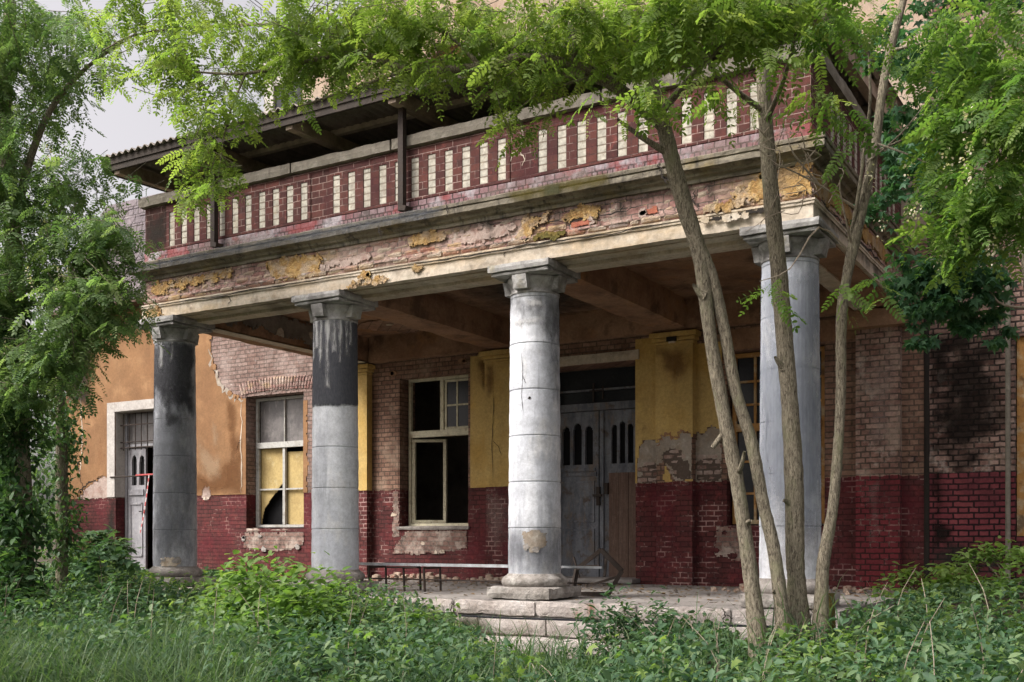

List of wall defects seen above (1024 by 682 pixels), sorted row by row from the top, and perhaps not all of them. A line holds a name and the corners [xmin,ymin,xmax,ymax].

flaking render [700,173,764,224]
flaking render [408,203,601,247]
flaking render [145,267,233,317]
flaking render [265,251,389,289]
damp [313,320,351,358]
flaking render [208,315,313,492]
flaking render [372,358,470,555]
flaking render [636,425,722,484]
flaking render [76,476,107,500]
spalling [522,530,547,553]
spalling [714,526,741,561]